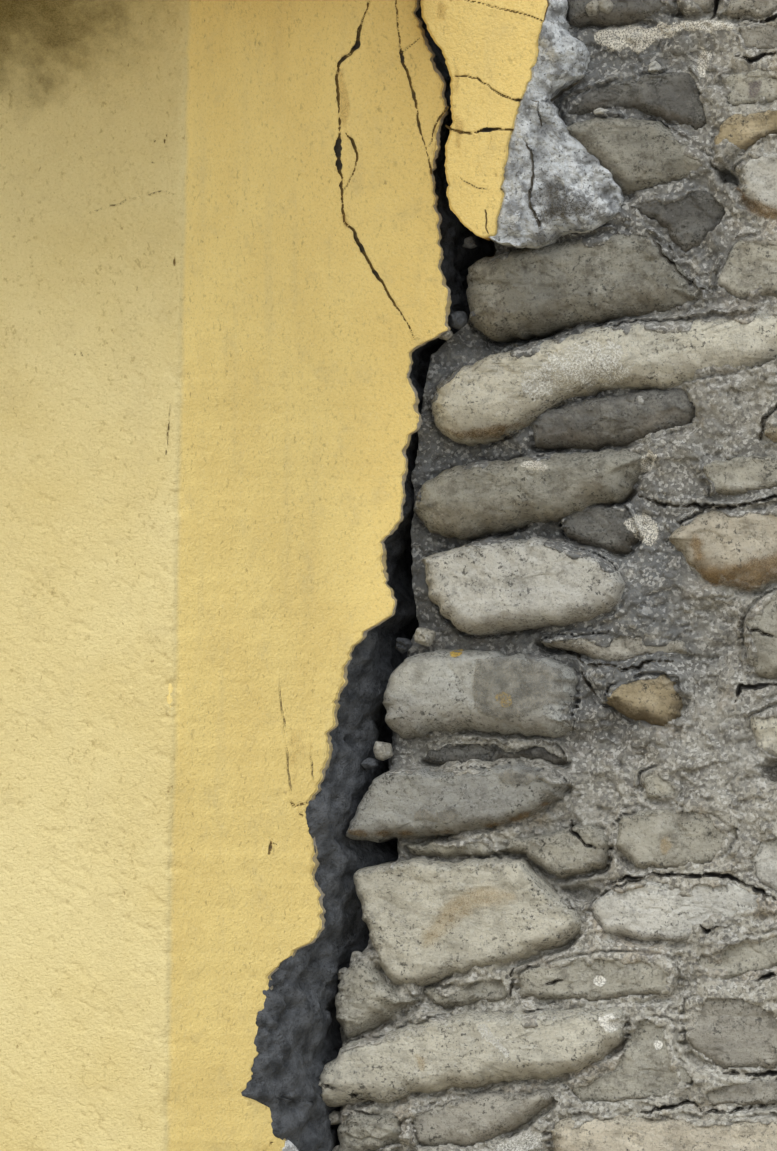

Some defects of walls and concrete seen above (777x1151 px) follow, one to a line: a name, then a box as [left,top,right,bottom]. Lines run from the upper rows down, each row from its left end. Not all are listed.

leakage [0,0,116,61]
crack [334,0,580,338]
peeling [488,0,625,249]
spalling [263,1140,298,1151]